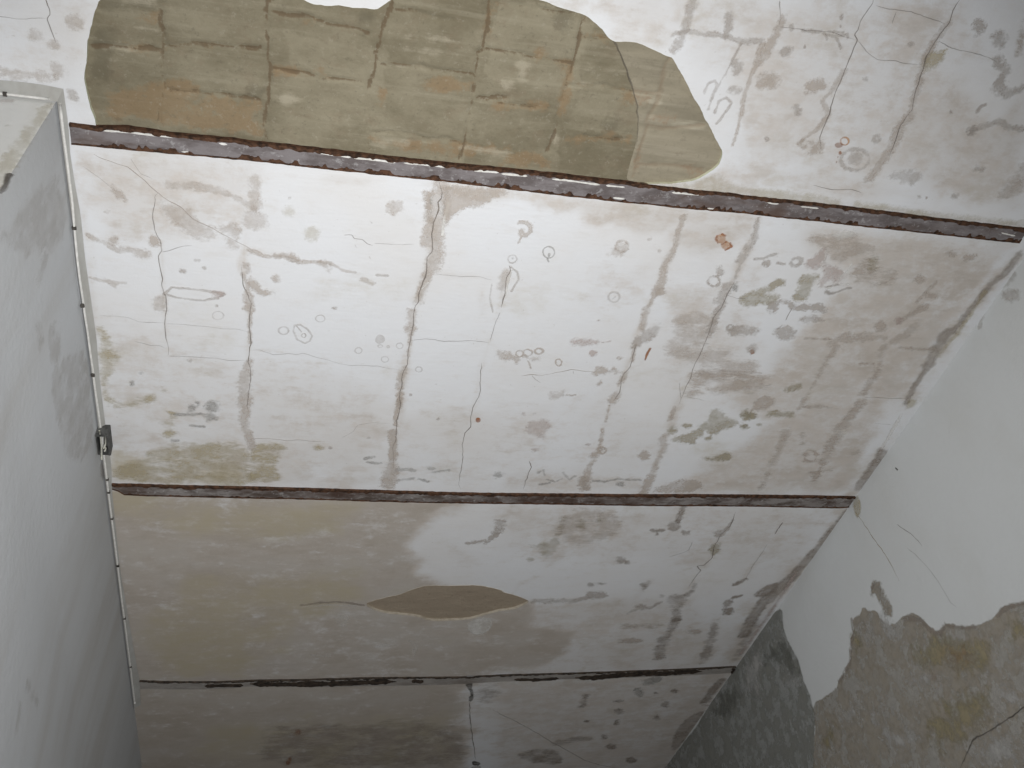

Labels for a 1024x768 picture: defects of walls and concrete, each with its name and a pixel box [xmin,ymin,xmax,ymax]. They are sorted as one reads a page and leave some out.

spalling [84,0,722,200]
crack [819,3,873,145]
rust [69,122,1024,244]
crack [97,156,260,405]
crack [408,268,427,351]
damp [711,262,825,312]
damp [388,393,403,460]
damp [670,396,778,444]
rust [112,483,860,515]
spalling [367,585,528,634]
rust [139,666,736,688]
peeling [665,581,1024,768]